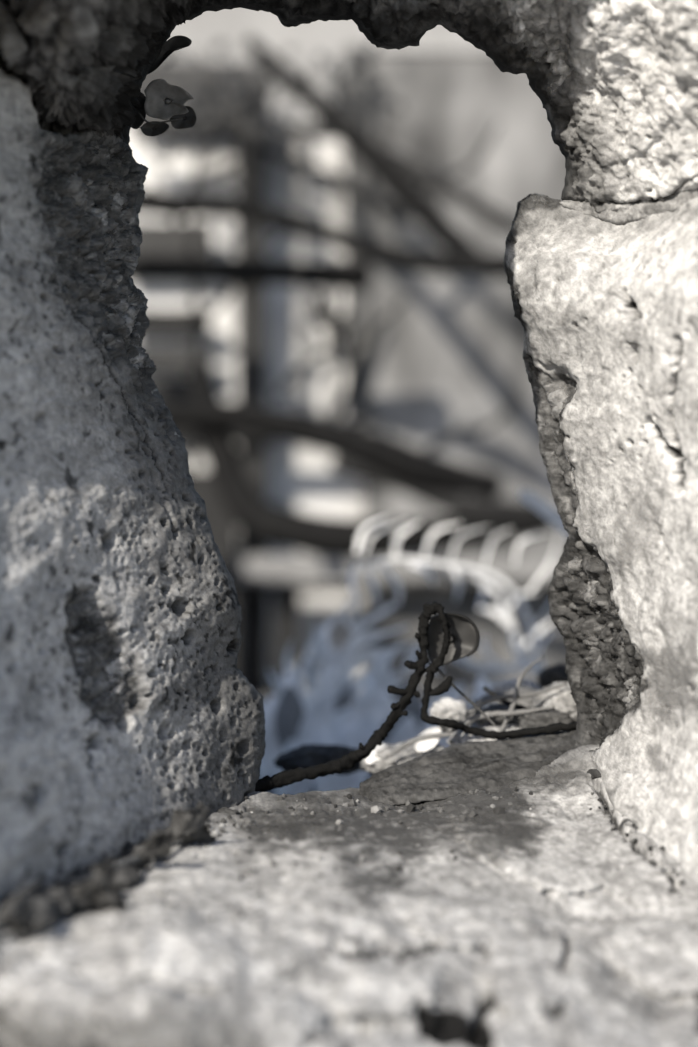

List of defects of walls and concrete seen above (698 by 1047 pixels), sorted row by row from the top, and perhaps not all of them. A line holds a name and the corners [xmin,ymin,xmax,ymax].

peeling [499,0,577,87]
spalling [505,194,561,244]
spalling [504,263,524,329]
crack [659,427,686,486]
spalling [522,352,648,749]